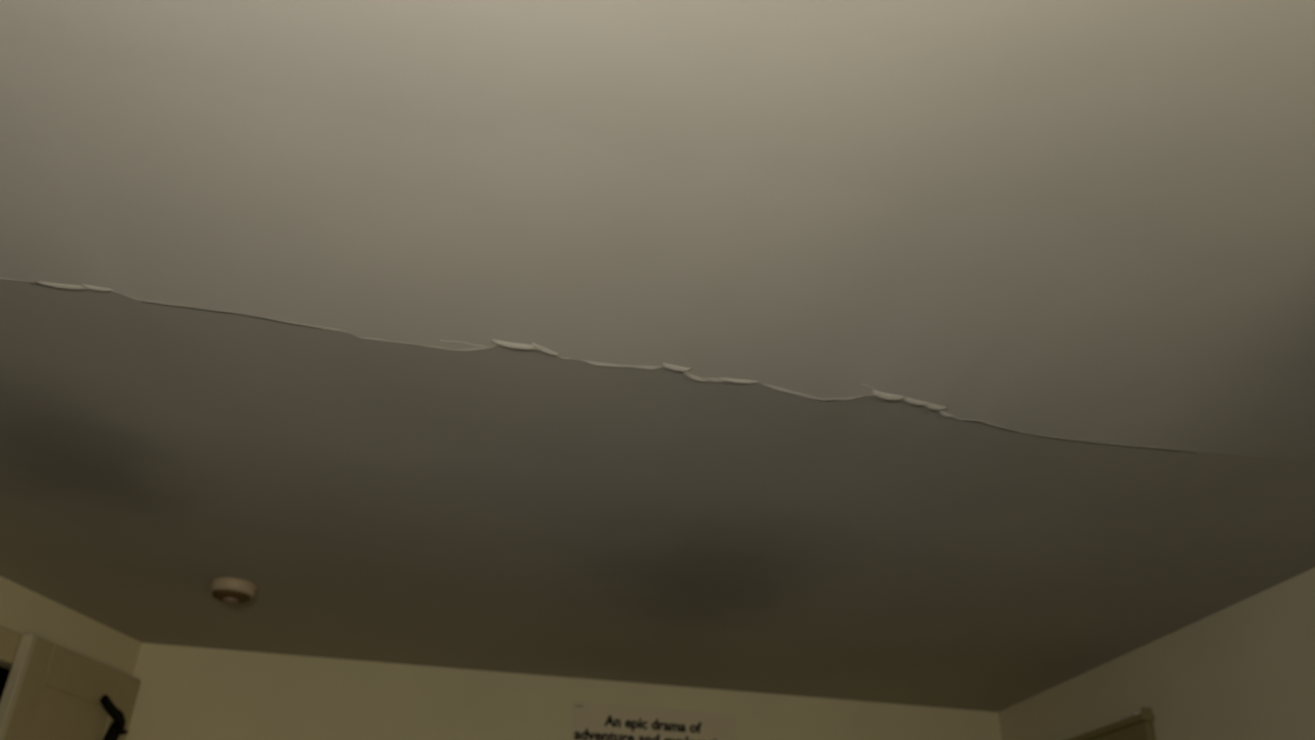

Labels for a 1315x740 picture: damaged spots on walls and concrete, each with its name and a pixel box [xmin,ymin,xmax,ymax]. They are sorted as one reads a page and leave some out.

crack [0,277,1202,453]